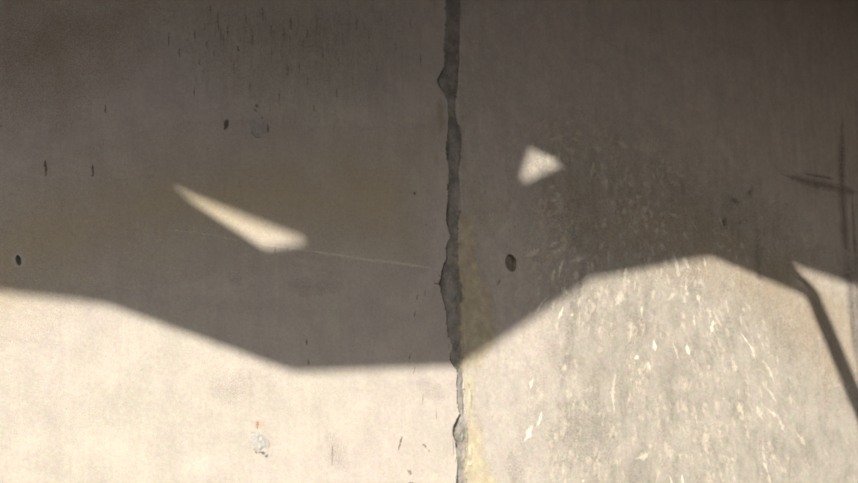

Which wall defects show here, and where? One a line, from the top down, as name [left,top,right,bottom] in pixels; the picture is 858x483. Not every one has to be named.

water stain [453,209,500,483]
water stain [506,107,858,483]